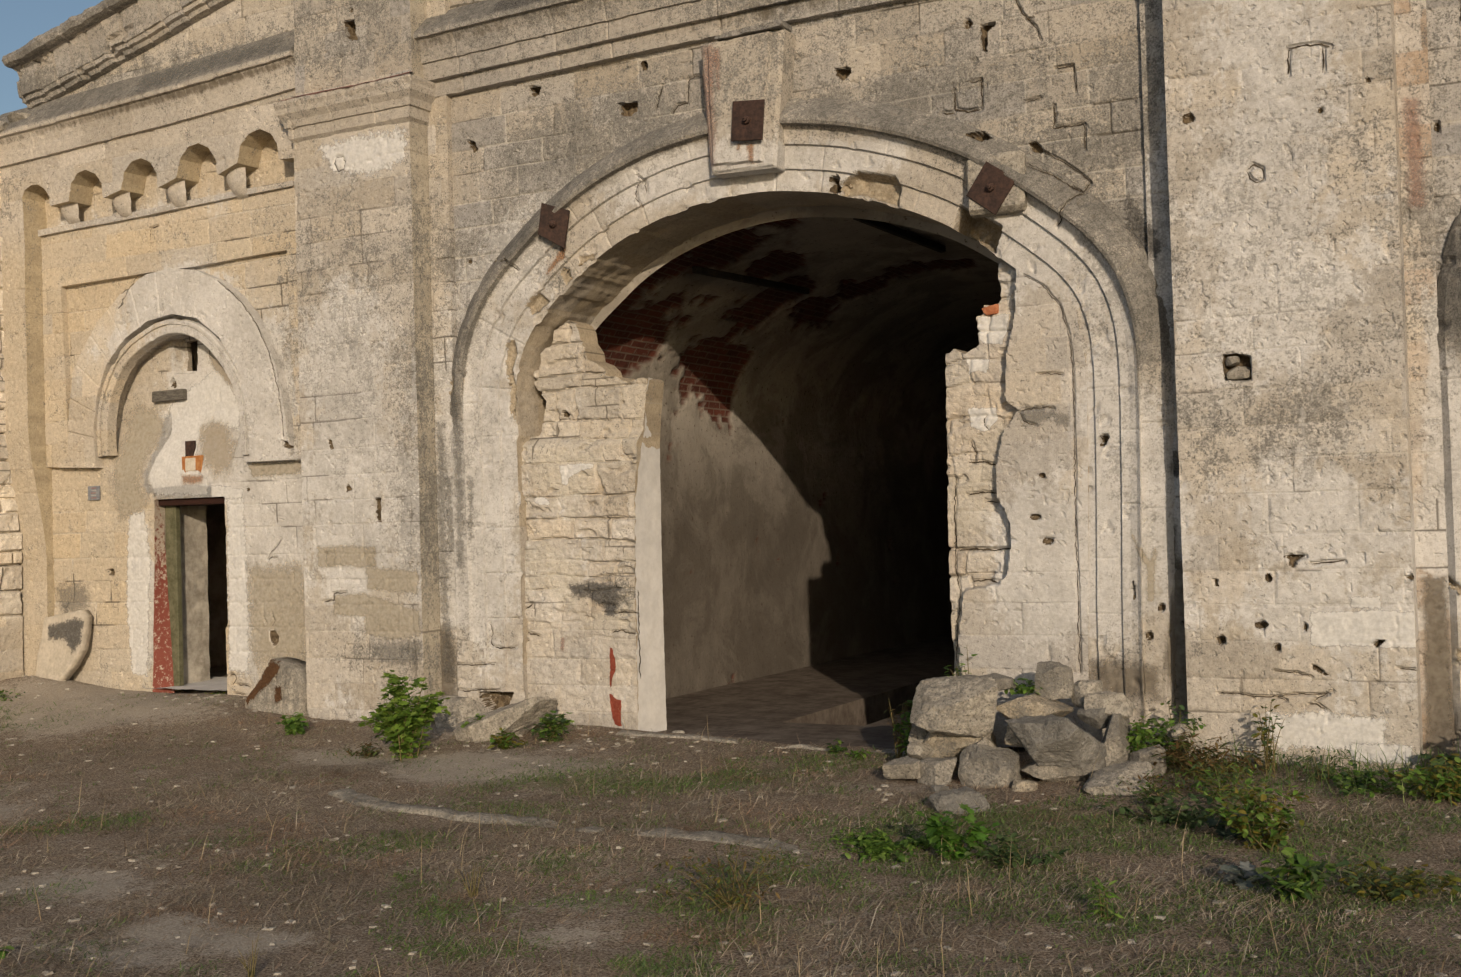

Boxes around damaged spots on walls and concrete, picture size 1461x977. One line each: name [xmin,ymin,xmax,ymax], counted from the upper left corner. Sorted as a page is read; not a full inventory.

peeling [211,356,232,384]
leakage [569,581,620,616]
leakage [1424,577,1453,761]